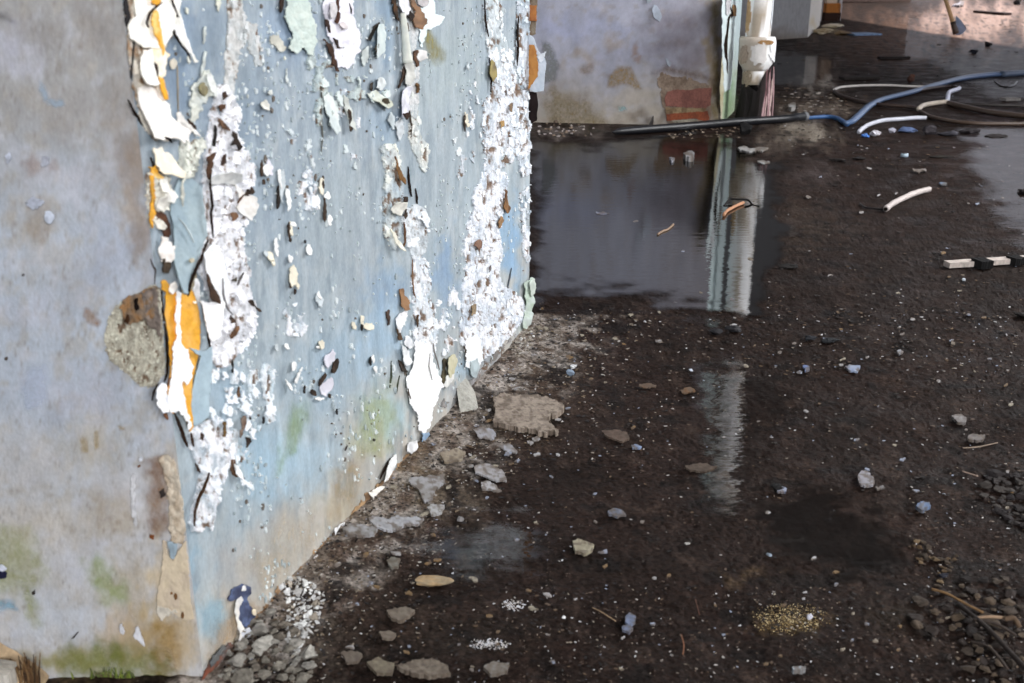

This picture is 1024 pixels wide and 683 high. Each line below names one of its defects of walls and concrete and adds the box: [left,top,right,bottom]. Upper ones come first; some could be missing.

peeling [104,0,546,621]
flaking render [657,0,776,123]